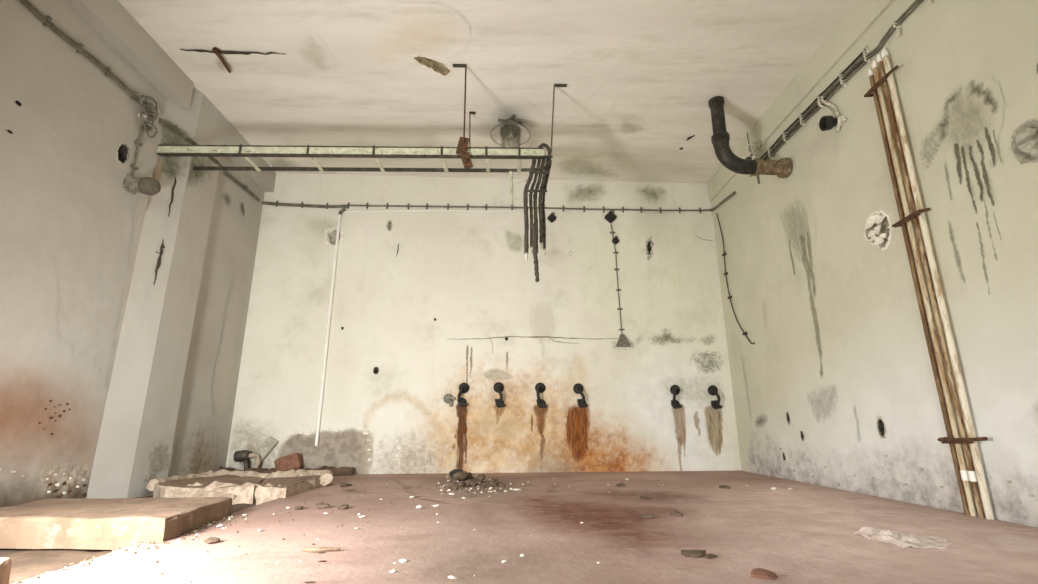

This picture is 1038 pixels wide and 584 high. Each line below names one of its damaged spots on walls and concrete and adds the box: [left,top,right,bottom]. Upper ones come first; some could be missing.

spalling [1010,119,1038,164]
crack [153,177,177,285]
spalling [863,210,892,251]
damp [264,72,1038,584]
rust [0,341,107,477]
rust [395,339,725,473]
spalling [740,411,1038,528]